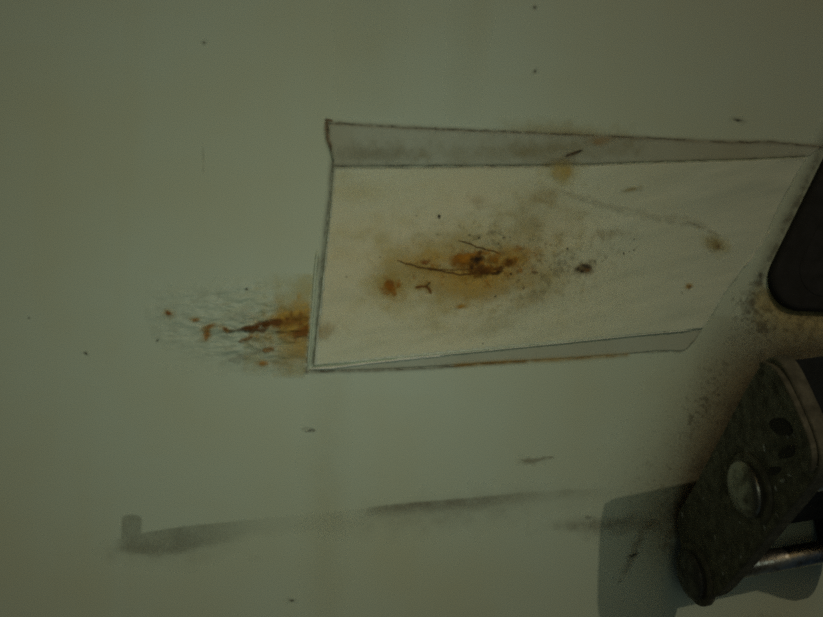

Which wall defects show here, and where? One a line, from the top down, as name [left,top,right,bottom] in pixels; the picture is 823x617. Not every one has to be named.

corrosion [223,291,310,365]
corrosion [322,168,583,348]